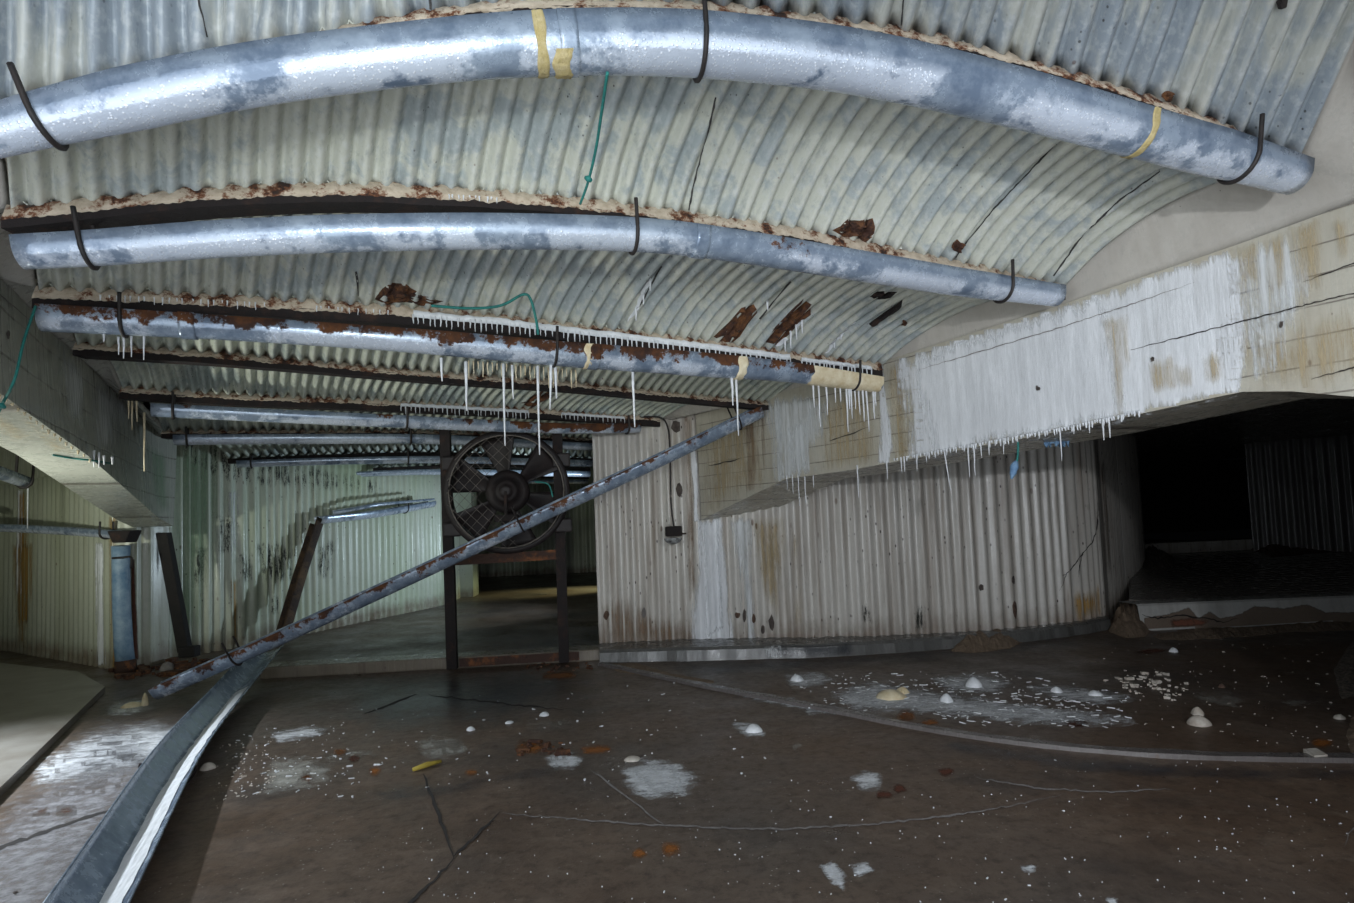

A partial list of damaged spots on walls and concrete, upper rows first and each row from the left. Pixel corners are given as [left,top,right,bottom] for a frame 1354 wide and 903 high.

rust [1161,91,1175,102]
rust [833,218,875,242]
rust [714,304,757,342]
rust [766,300,812,345]
damp [400,226,1354,494]
rust [522,391,552,408]
damp [15,489,32,640]
damp [689,451,779,639]
damp [95,518,115,666]
damp [612,607,672,641]
crack [408,769,1172,903]